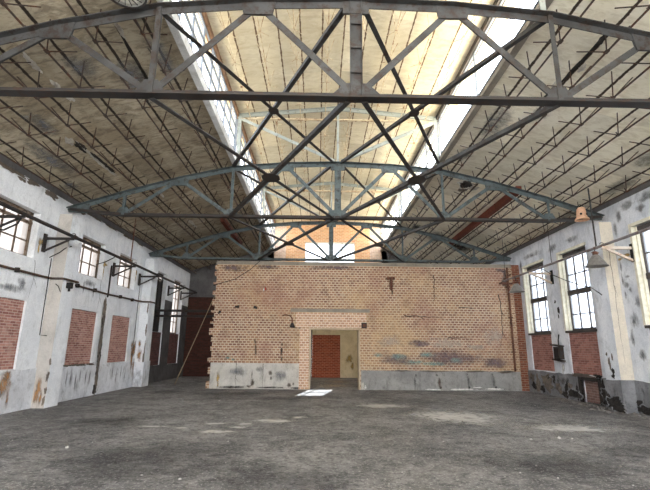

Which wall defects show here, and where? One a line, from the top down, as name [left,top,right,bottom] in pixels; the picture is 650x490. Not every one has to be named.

corrosion [0,372,10,403]
flaking render [529,372,628,414]